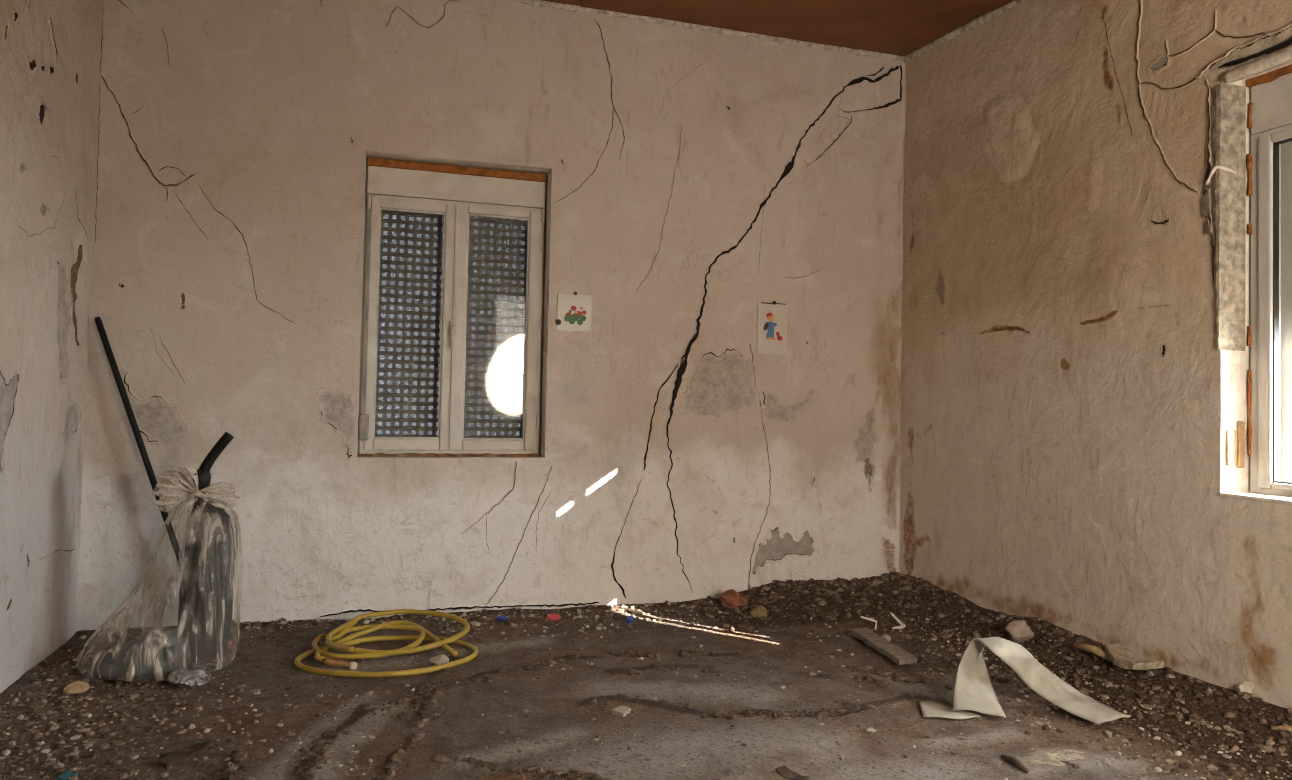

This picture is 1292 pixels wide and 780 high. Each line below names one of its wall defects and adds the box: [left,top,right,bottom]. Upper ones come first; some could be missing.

crack [385,0,463,29]
crack [74,0,292,322]
crack [555,18,626,203]
crack [1103,0,1292,284]
flaking render [0,366,19,476]
crack [320,65,903,618]
flaking render [750,524,818,578]
crack [668,702,879,717]